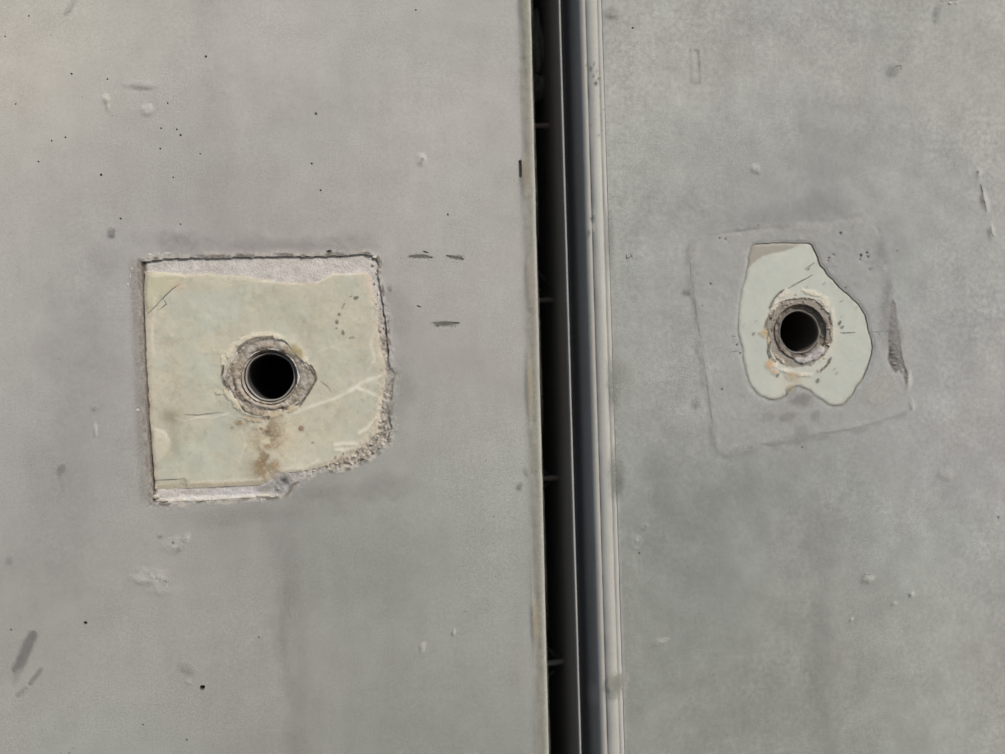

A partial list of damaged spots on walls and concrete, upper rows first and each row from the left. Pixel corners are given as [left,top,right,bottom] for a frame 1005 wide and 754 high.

spalling [127,249,400,509]
peeling [887,299,909,384]
rust [254,418,281,477]